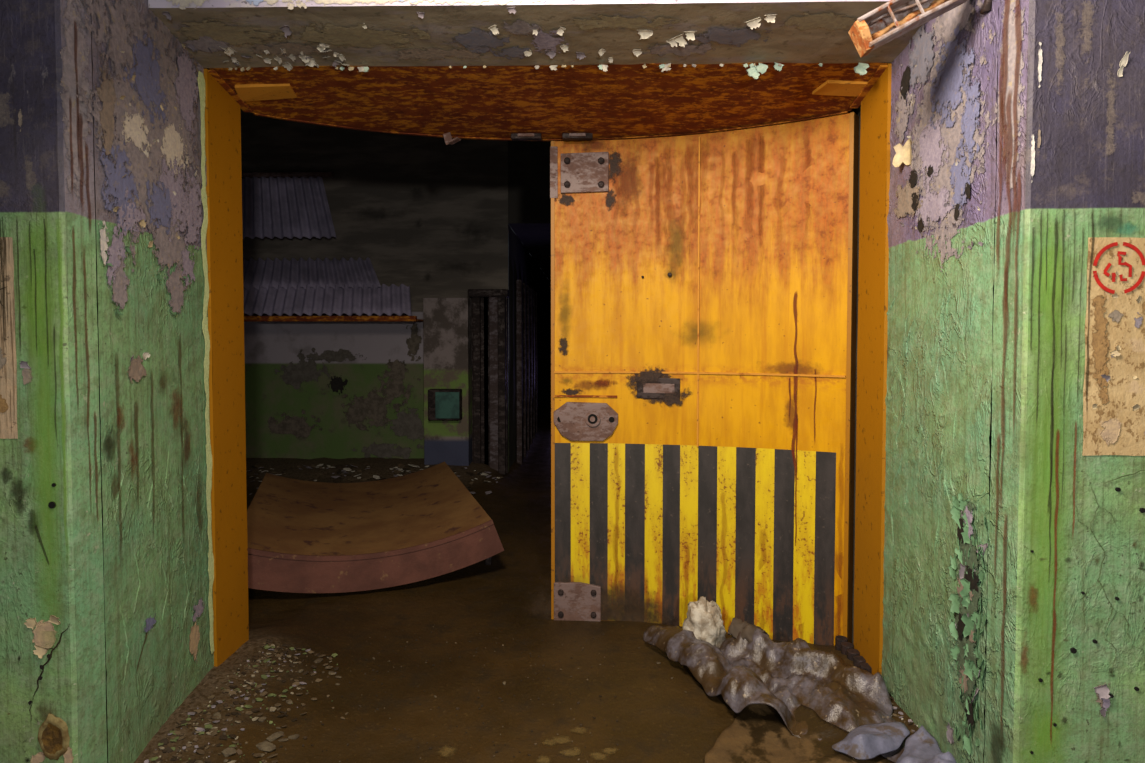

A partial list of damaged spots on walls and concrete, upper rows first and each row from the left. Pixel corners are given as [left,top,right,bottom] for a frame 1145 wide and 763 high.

peeling [74,0,857,315]
rust [554,193,575,206]
rust [606,152,623,211]
peeling [854,63,869,76]
peeling [892,0,998,273]
rust [789,293,798,543]
peeling [24,615,61,658]
spalling [26,713,74,763]
peeling [946,493,988,758]
crack [1075,470,1145,676]